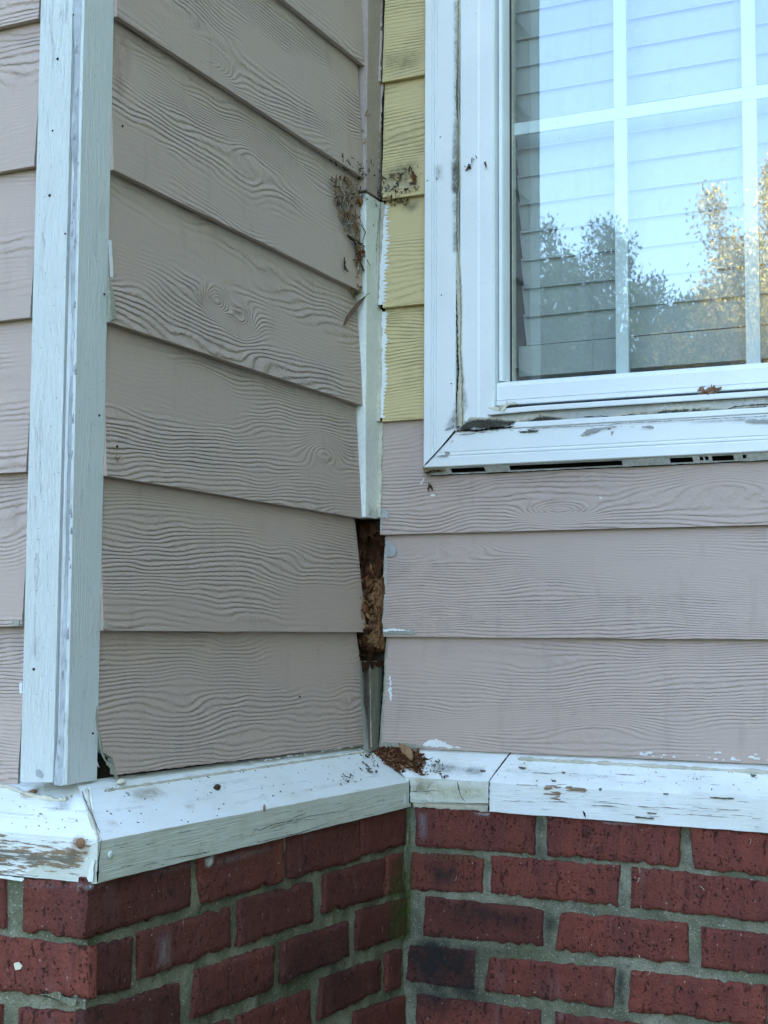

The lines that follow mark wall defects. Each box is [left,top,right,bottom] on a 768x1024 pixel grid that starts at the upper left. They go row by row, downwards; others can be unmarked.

peeling [356,550,417,661]
peeling [508,752,768,819]
peeling [0,834,92,877]